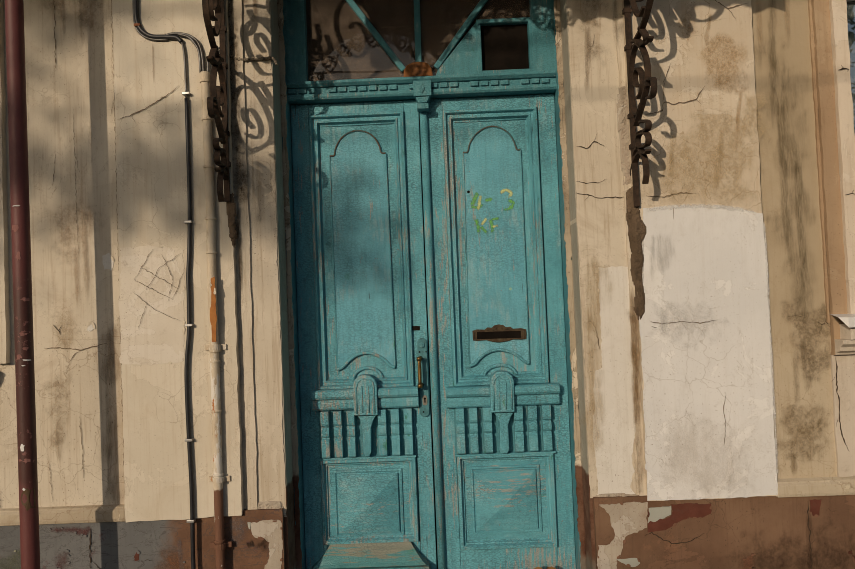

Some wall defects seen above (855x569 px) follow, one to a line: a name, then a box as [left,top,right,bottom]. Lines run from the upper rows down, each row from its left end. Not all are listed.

crack [649,66,705,114]
crack [47,318,121,366]
crack [832,362,848,449]
flaking render [247,501,286,569]
flaking render [595,493,712,569]